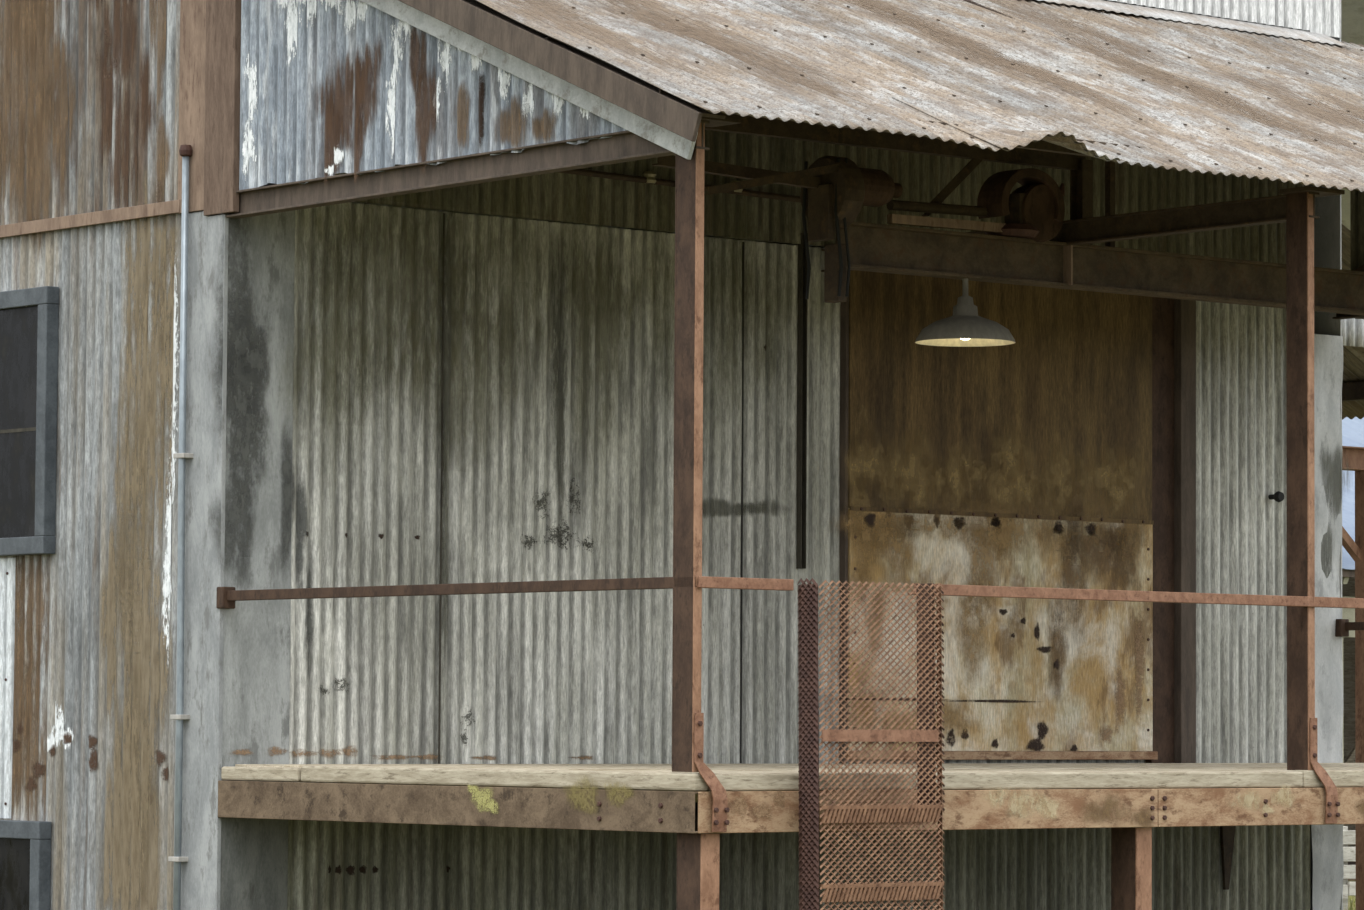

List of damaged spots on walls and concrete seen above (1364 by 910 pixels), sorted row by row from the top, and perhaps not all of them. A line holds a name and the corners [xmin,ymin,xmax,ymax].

peeling [242,53,258,181]
peeling [277,0,368,65]
peeling [325,148,344,176]
corrosion [317,42,380,181]
corrosion [409,29,437,170]
corrosion [457,85,469,144]
corrosion [500,97,556,147]
corrosion [87,0,180,910]
damp [211,213,267,580]
corrosion [844,441,1142,693]
corrosion [12,555,50,821]
corrosion [1028,722,1049,751]